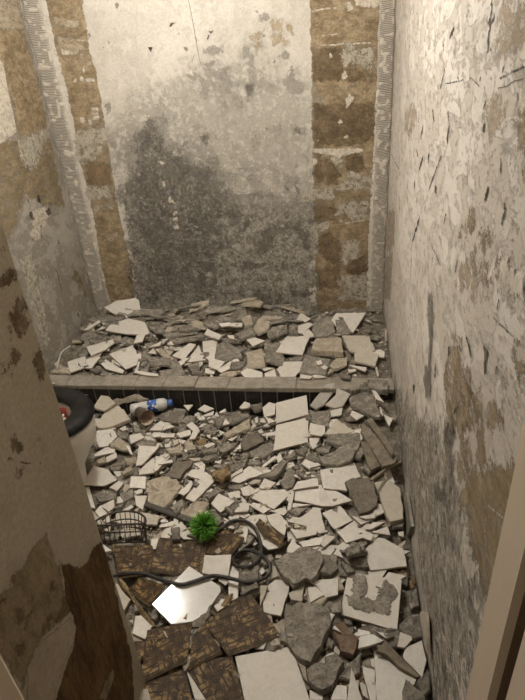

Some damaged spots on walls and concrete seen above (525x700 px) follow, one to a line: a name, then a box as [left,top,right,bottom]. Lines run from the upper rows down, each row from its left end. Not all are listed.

peeling [53,16,88,55]
peeling [312,0,380,12]
peeling [317,33,378,80]
peeling [0,60,48,172]
peeling [74,125,117,166]
spalling [29,195,51,241]
water stain [115,113,324,315]
peeling [335,239,370,302]
peeling [0,253,51,380]
peeling [493,317,525,387]
peeling [443,327,515,599]
peeling [27,618,76,700]